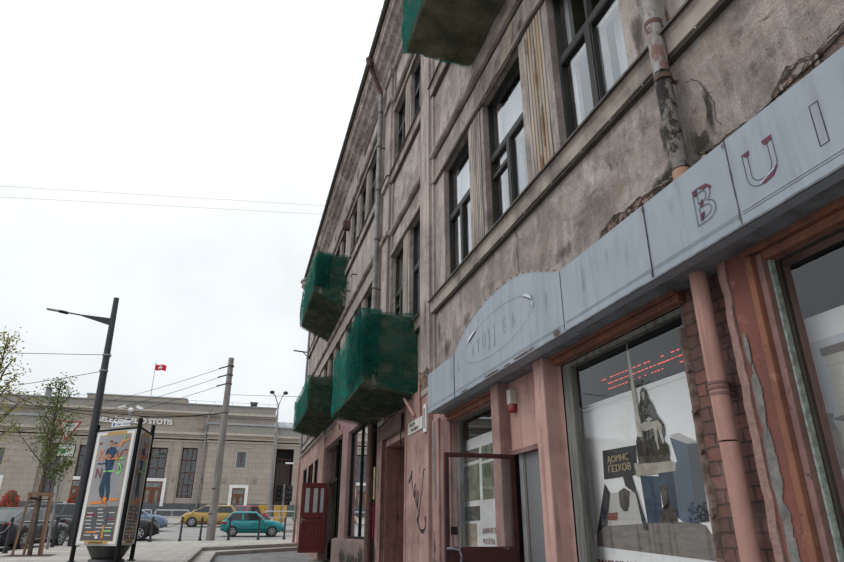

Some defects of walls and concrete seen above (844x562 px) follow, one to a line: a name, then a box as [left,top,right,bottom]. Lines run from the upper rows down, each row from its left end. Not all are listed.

flaking render [765,24,844,108]
crack [685,79,720,123]
flaking render [700,118,752,160]
flaking render [599,176,673,239]
peeling [743,333,801,562]